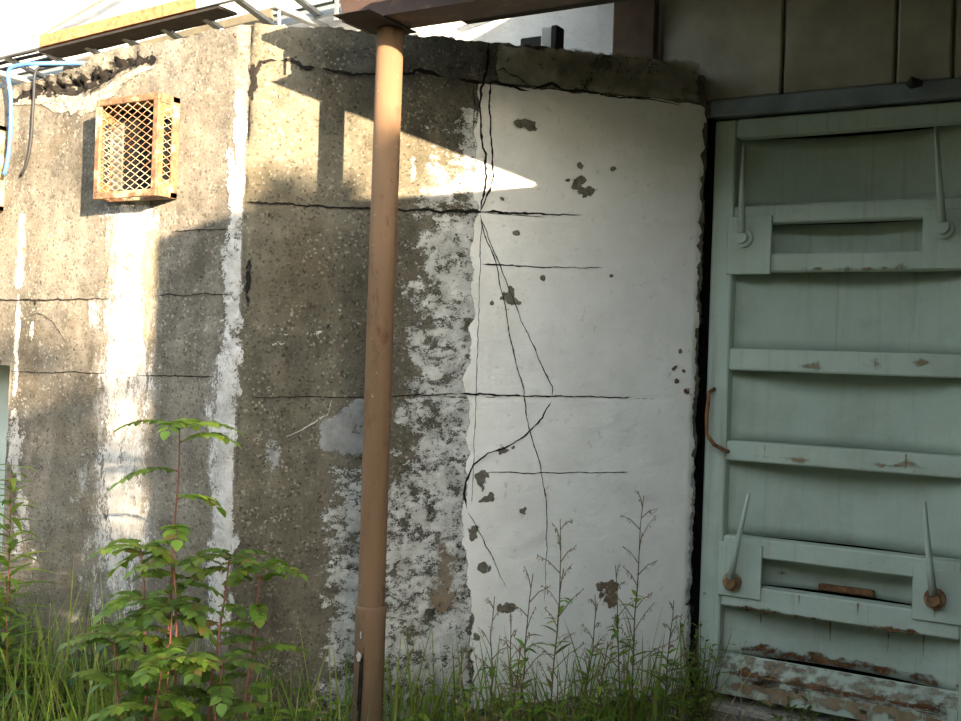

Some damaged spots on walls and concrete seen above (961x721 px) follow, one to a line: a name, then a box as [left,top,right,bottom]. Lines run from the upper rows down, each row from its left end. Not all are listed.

spalling [8,51,156,116]
damp [77,201,161,620]
damp [202,89,248,649]
crack [247,201,371,210]
crack [255,393,364,401]
crack [251,55,375,78]
peeling [313,399,364,719]
crack [392,43,678,601]
peeling [383,42,708,720]